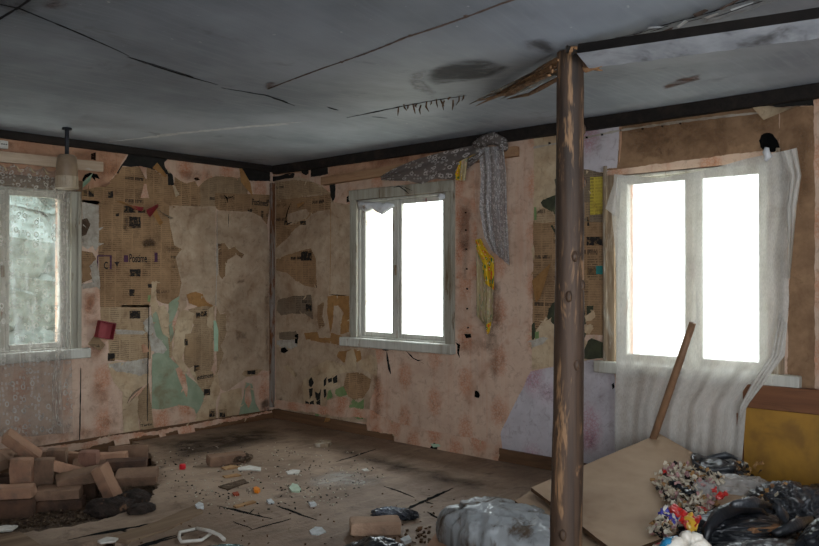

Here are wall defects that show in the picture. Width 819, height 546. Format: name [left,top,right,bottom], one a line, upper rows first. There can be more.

peeling [677,0,753,28]
water stain [434,62,504,79]
peeling [533,136,556,185]
peeling [584,127,619,172]
peeling [534,195,555,220]
peeling [274,334,298,353]
peeling [528,302,555,349]
peeling [152,364,196,428]
peeling [245,371,271,411]
peeling [501,367,553,457]
peeling [584,302,615,463]